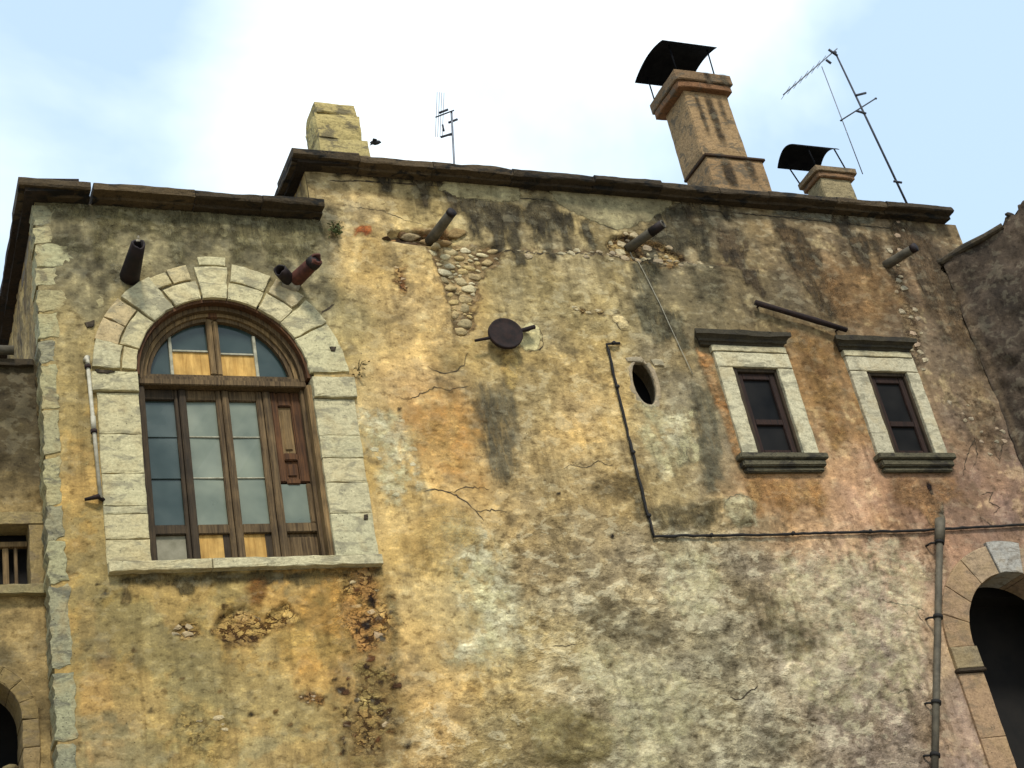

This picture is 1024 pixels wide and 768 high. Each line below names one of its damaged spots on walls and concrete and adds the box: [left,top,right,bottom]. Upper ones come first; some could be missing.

damp [336,173,596,265]
flaking render [504,232,720,269]
crack [402,386,467,399]
damp [475,385,517,480]
crack [426,486,505,519]
flaking render [172,597,298,646]
flaking render [296,567,402,768]